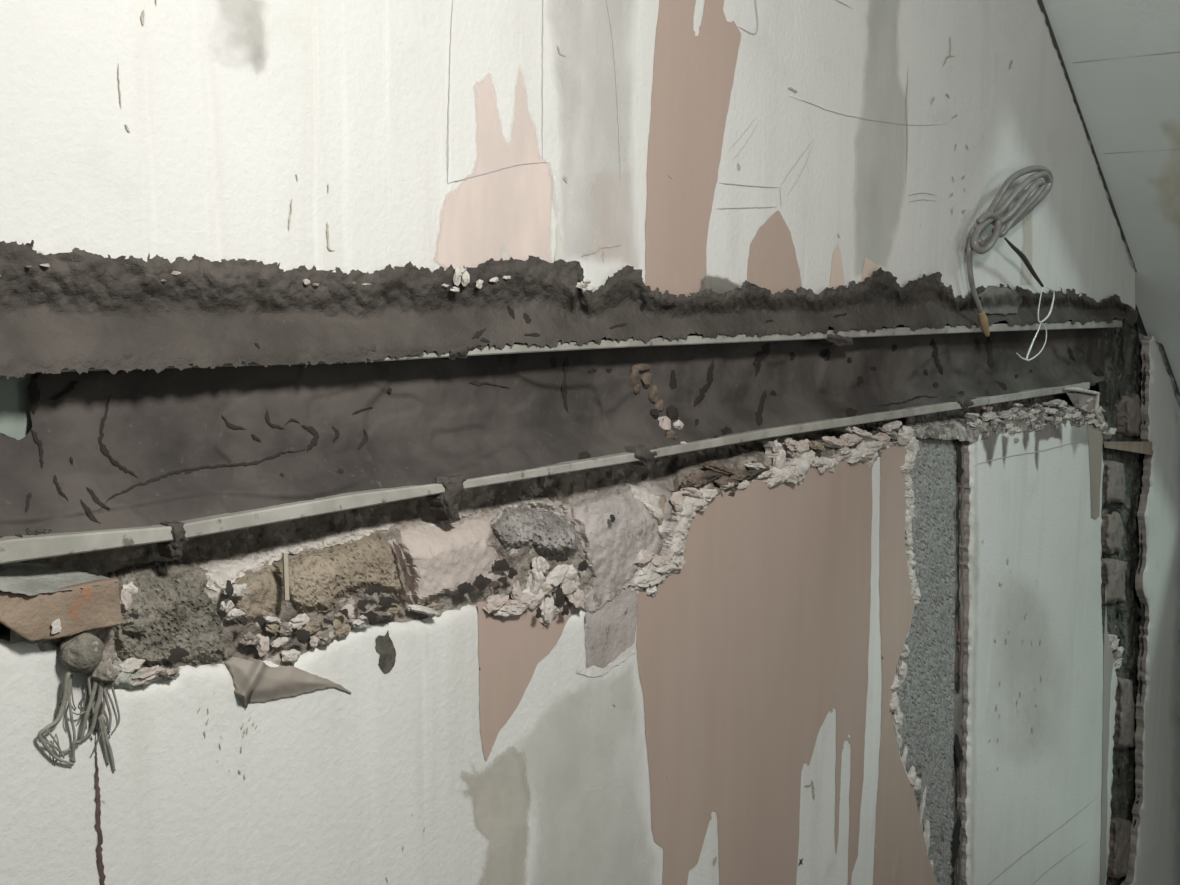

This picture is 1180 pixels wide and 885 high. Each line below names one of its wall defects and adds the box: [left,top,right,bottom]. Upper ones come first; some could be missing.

peeling [435,75,552,292]
peeling [640,0,741,311]
peeling [748,210,802,295]
crack [25,375,373,523]
spalling [9,629,69,651]
peeling [19,391,1107,885]
peeling [1100,590,1114,885]